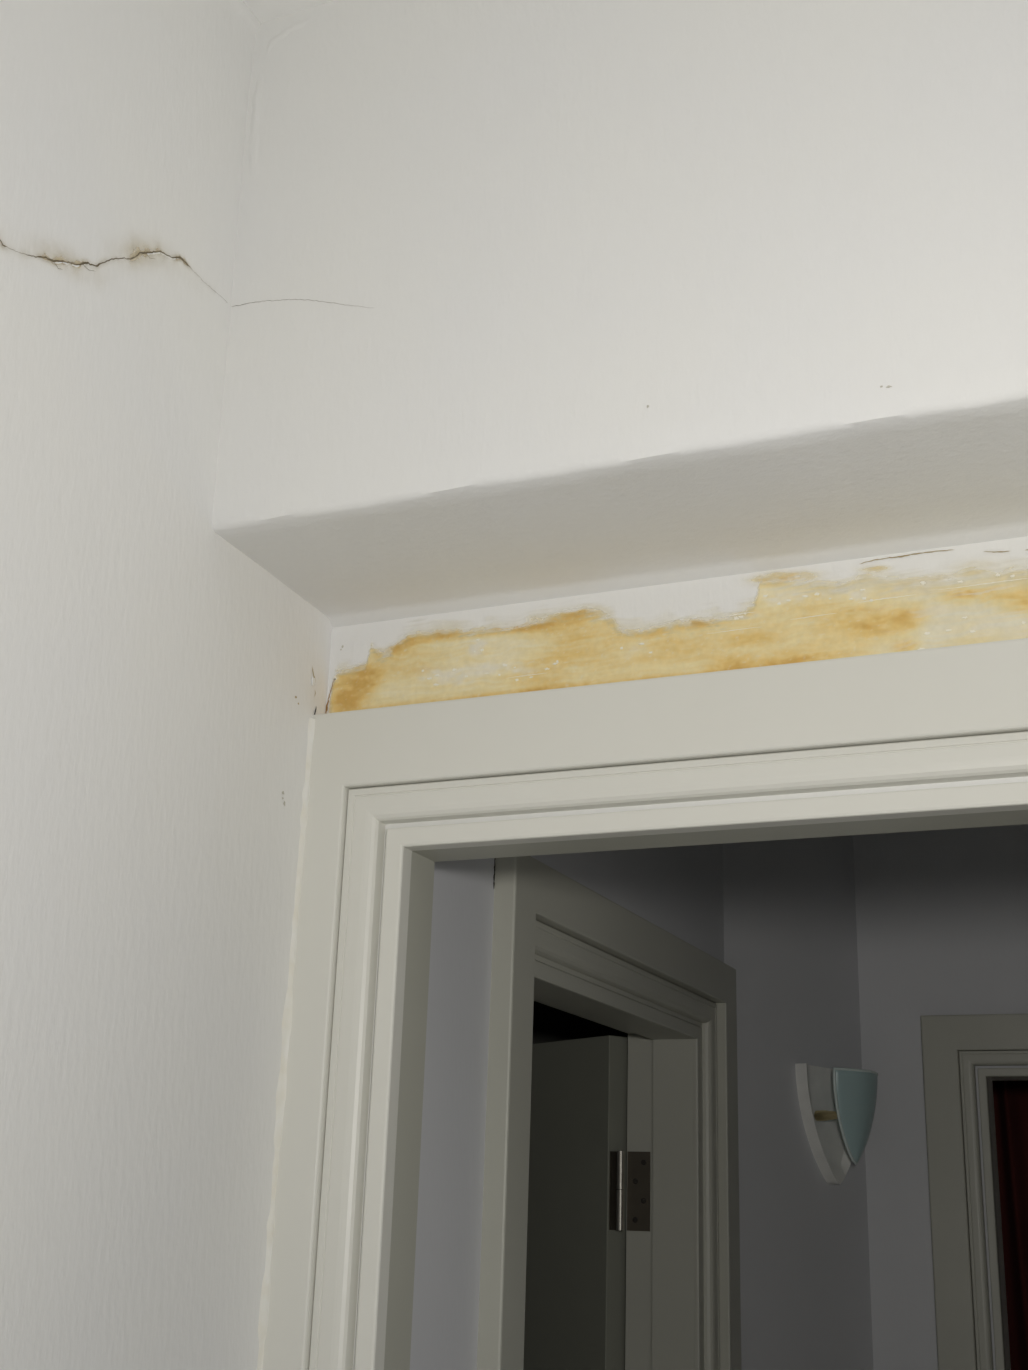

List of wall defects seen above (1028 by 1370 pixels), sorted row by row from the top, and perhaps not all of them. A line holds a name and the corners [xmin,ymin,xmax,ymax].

crack [0,240,373,308]